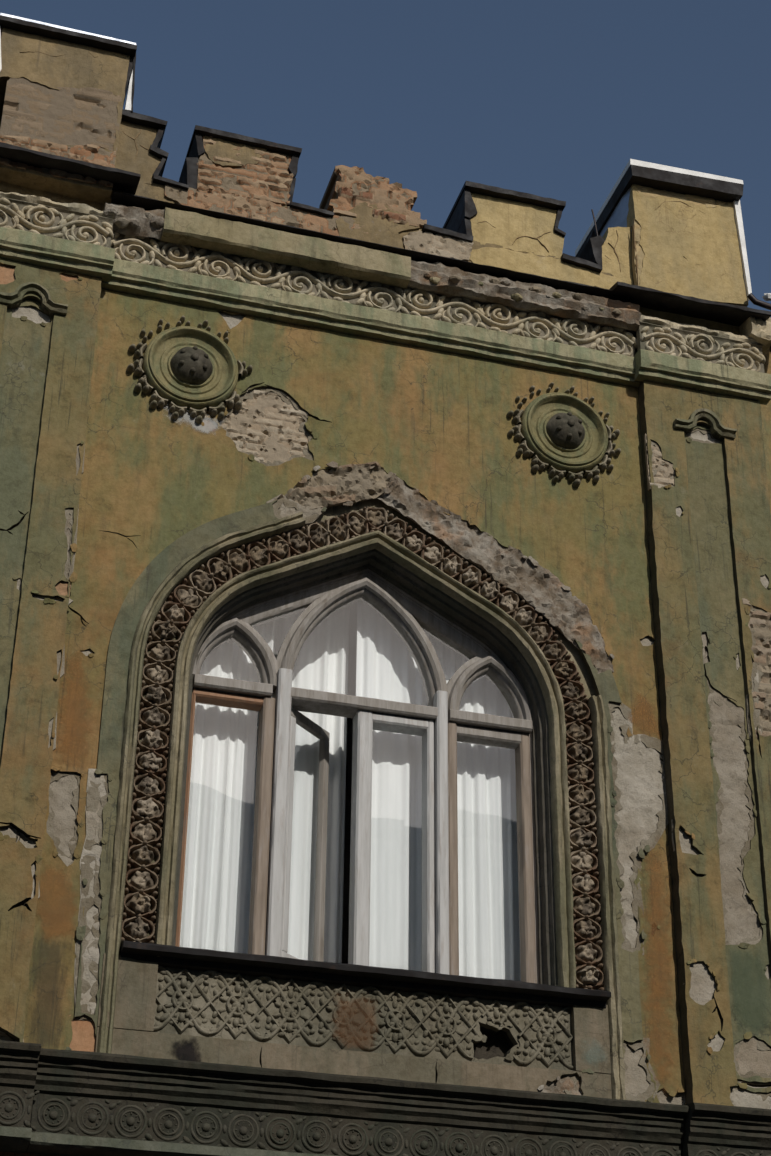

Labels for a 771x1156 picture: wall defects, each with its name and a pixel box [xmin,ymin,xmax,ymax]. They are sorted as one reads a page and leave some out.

spalling [0,77,122,187]
crack [479,221,552,252]
flaking render [201,386,396,525]
flaking render [644,433,680,491]
peeling [535,606,558,627]
peeling [706,598,771,949]
peeling [608,702,699,955]
crack [8,898,31,911]
peeling [0,713,112,1052]
spalling [683,959,721,1005]
spalling [472,1021,511,1060]
spalling [707,1032,771,1109]